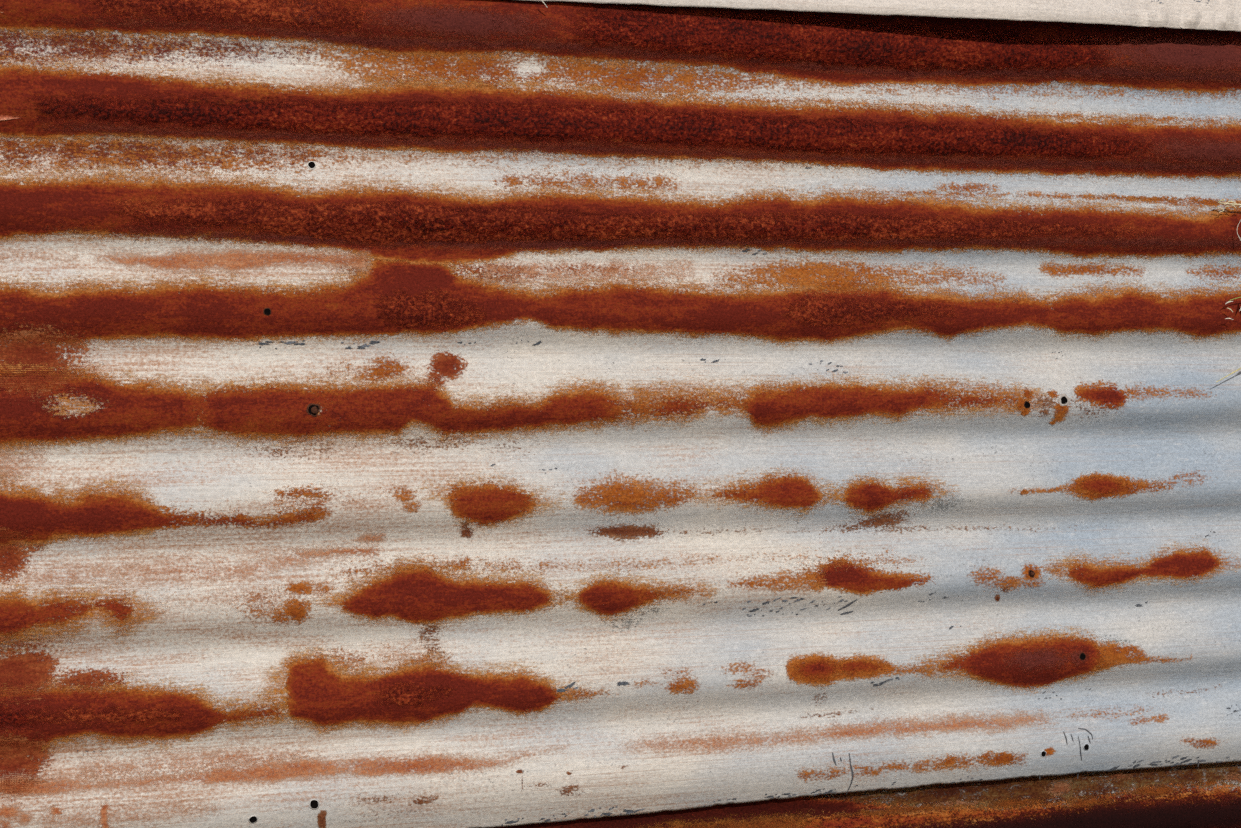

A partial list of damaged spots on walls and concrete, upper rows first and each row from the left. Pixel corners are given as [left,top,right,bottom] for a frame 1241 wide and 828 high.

corrosion [0,0,1241,584]
corrosion [708,548,933,597]
corrosion [971,545,1241,601]
corrosion [0,546,716,828]
corrosion [632,628,1192,753]
corrosion [1184,737,1217,749]